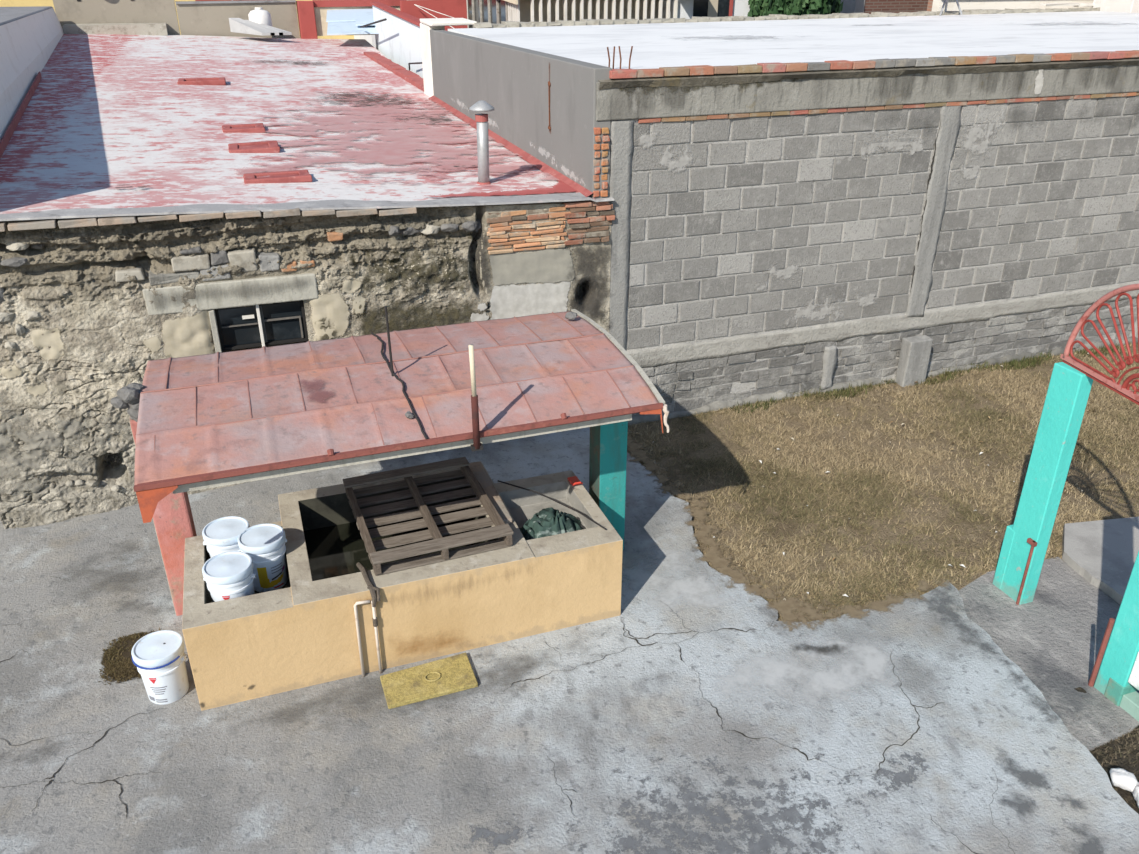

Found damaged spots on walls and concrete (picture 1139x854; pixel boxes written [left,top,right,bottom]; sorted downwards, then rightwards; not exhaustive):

hole [107,453,124,467]
crack [509,601,939,776]
crack [0,708,166,817]